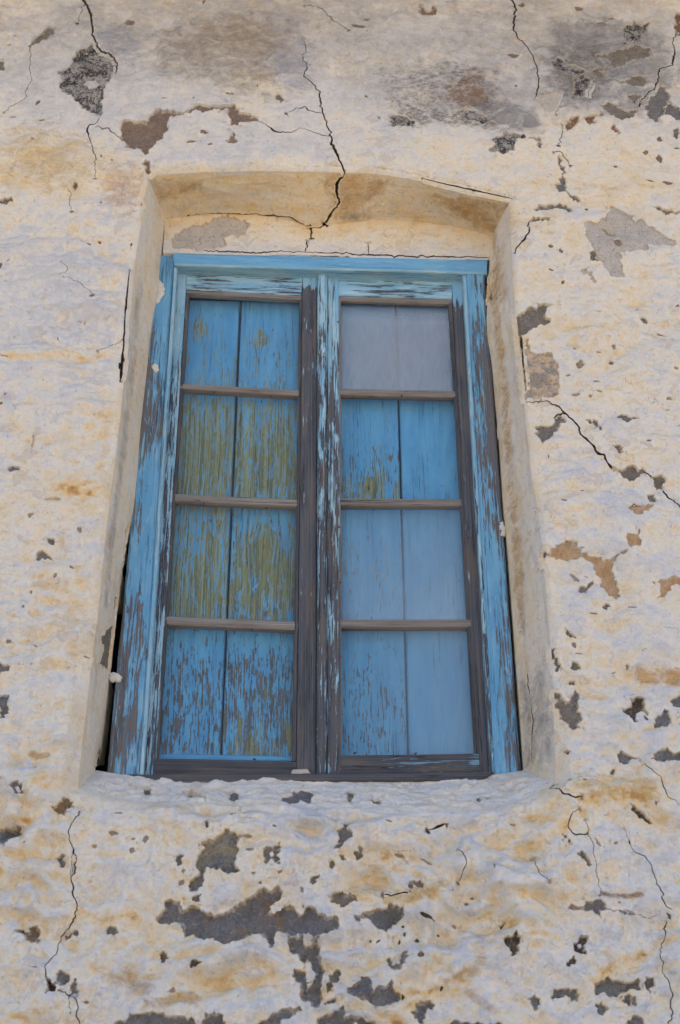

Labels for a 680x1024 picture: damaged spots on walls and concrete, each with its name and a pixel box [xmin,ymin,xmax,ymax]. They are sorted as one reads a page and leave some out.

spalling [54,36,262,180]
crack [189,37,534,260]
crack [508,0,598,166]
spalling [450,105,680,287]
spalling [544,4,680,187]
crack [98,270,134,382]
spalling [512,299,671,619]
crack [518,335,680,512]
spalling [546,624,588,760]
crack [40,812,85,1024]
spalling [150,786,507,1024]
crack [546,784,678,1024]